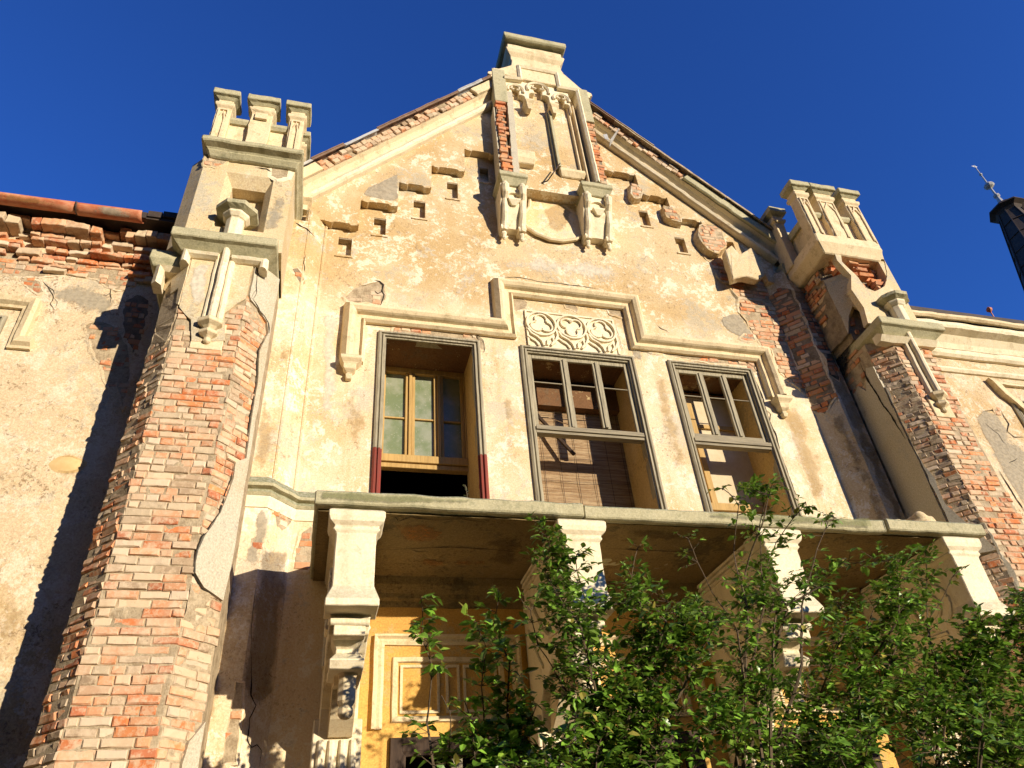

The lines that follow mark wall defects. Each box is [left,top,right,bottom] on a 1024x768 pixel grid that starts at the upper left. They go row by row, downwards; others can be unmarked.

spalling [341,280,389,306]
crack [860,363,905,438]
spalling [693,224,1024,671]
spalling [0,251,266,768]
spalling [247,510,313,575]